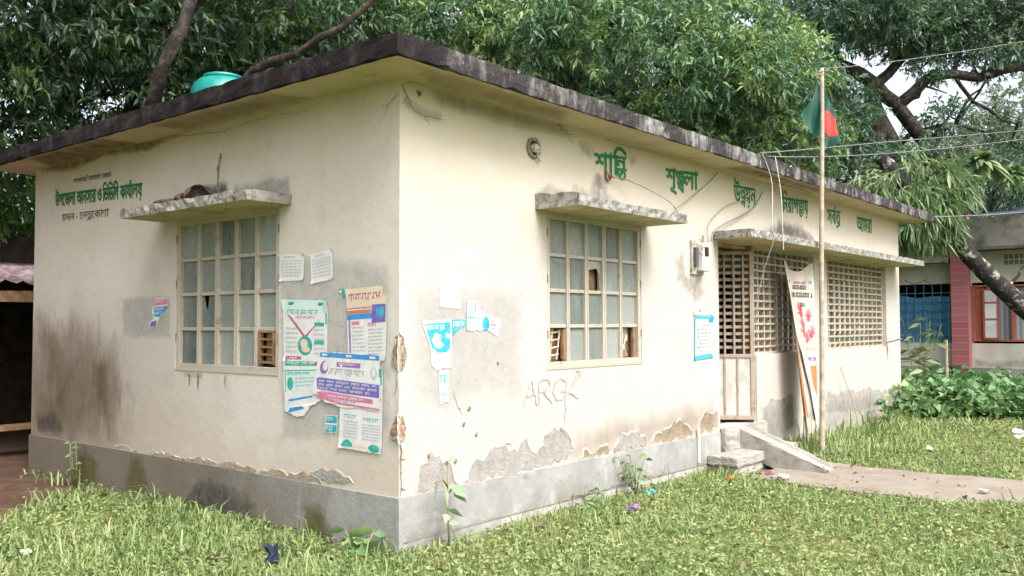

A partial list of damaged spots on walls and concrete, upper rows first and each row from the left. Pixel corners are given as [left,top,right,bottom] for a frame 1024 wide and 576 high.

crack [380,82,444,123]
flaking render [391,331,407,372]
flaking render [390,414,406,445]
flaking render [150,451,353,485]
flaking render [414,410,719,494]